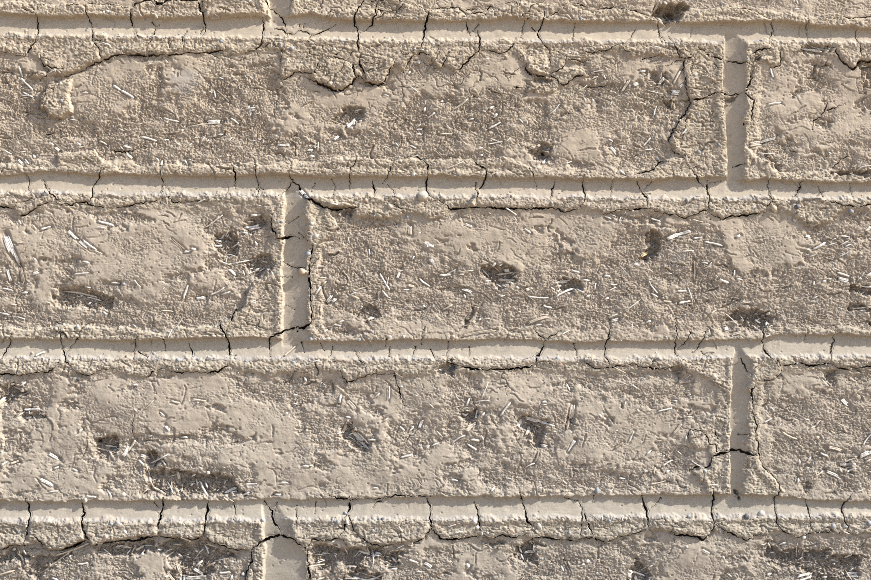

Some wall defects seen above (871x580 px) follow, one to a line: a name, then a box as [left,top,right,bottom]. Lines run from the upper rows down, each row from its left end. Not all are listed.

crack [0,0,871,221]
crack [0,309,237,378]
crack [0,322,871,580]
crack [230,155,707,406]